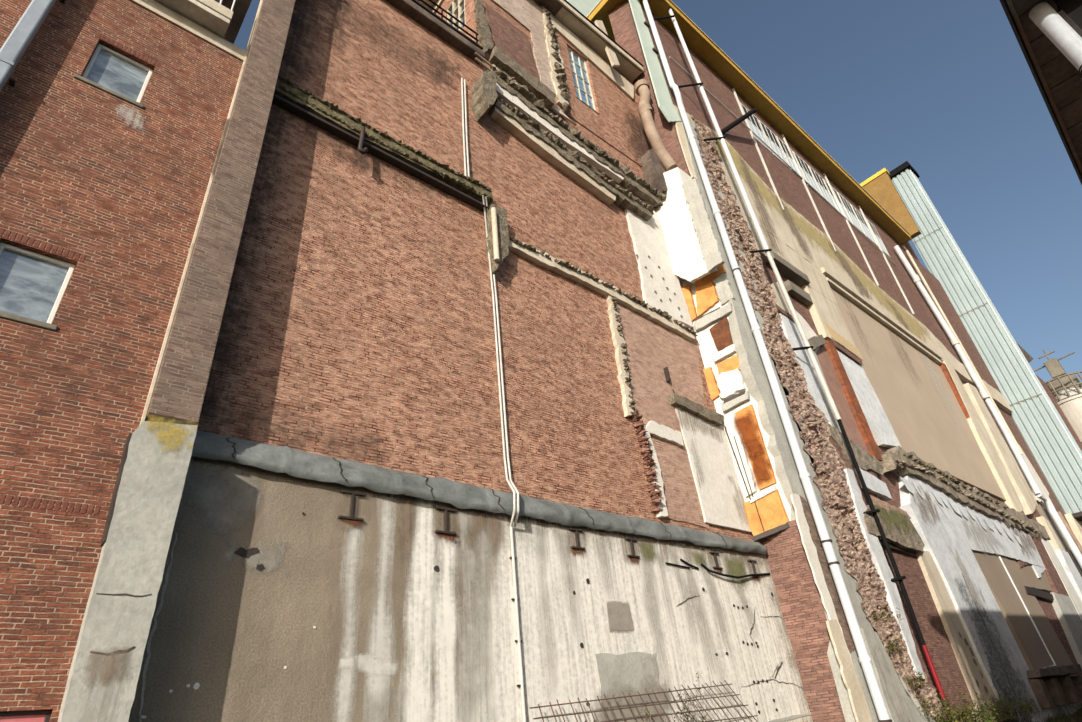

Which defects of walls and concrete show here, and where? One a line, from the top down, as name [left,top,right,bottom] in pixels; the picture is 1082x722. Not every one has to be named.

crack [90,533,177,722]
spalling [225,541,284,571]
water stain [337,496,500,722]
crack [742,662,803,689]
water stain [958,584,1044,722]